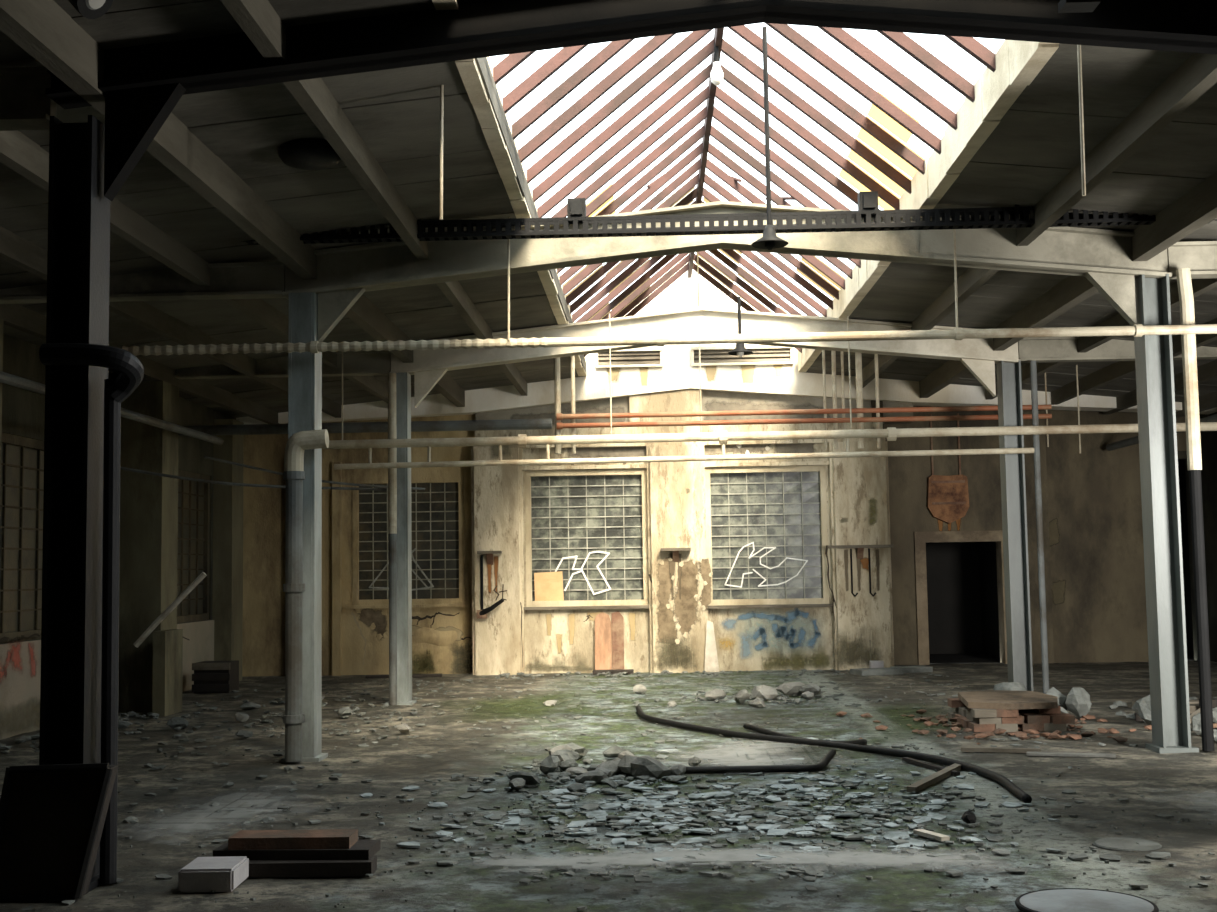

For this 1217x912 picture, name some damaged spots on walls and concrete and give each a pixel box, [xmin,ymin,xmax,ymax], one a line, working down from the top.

rust [486,556,499,593]
rust [844,549,879,591]
flaking render [656,558,713,644]